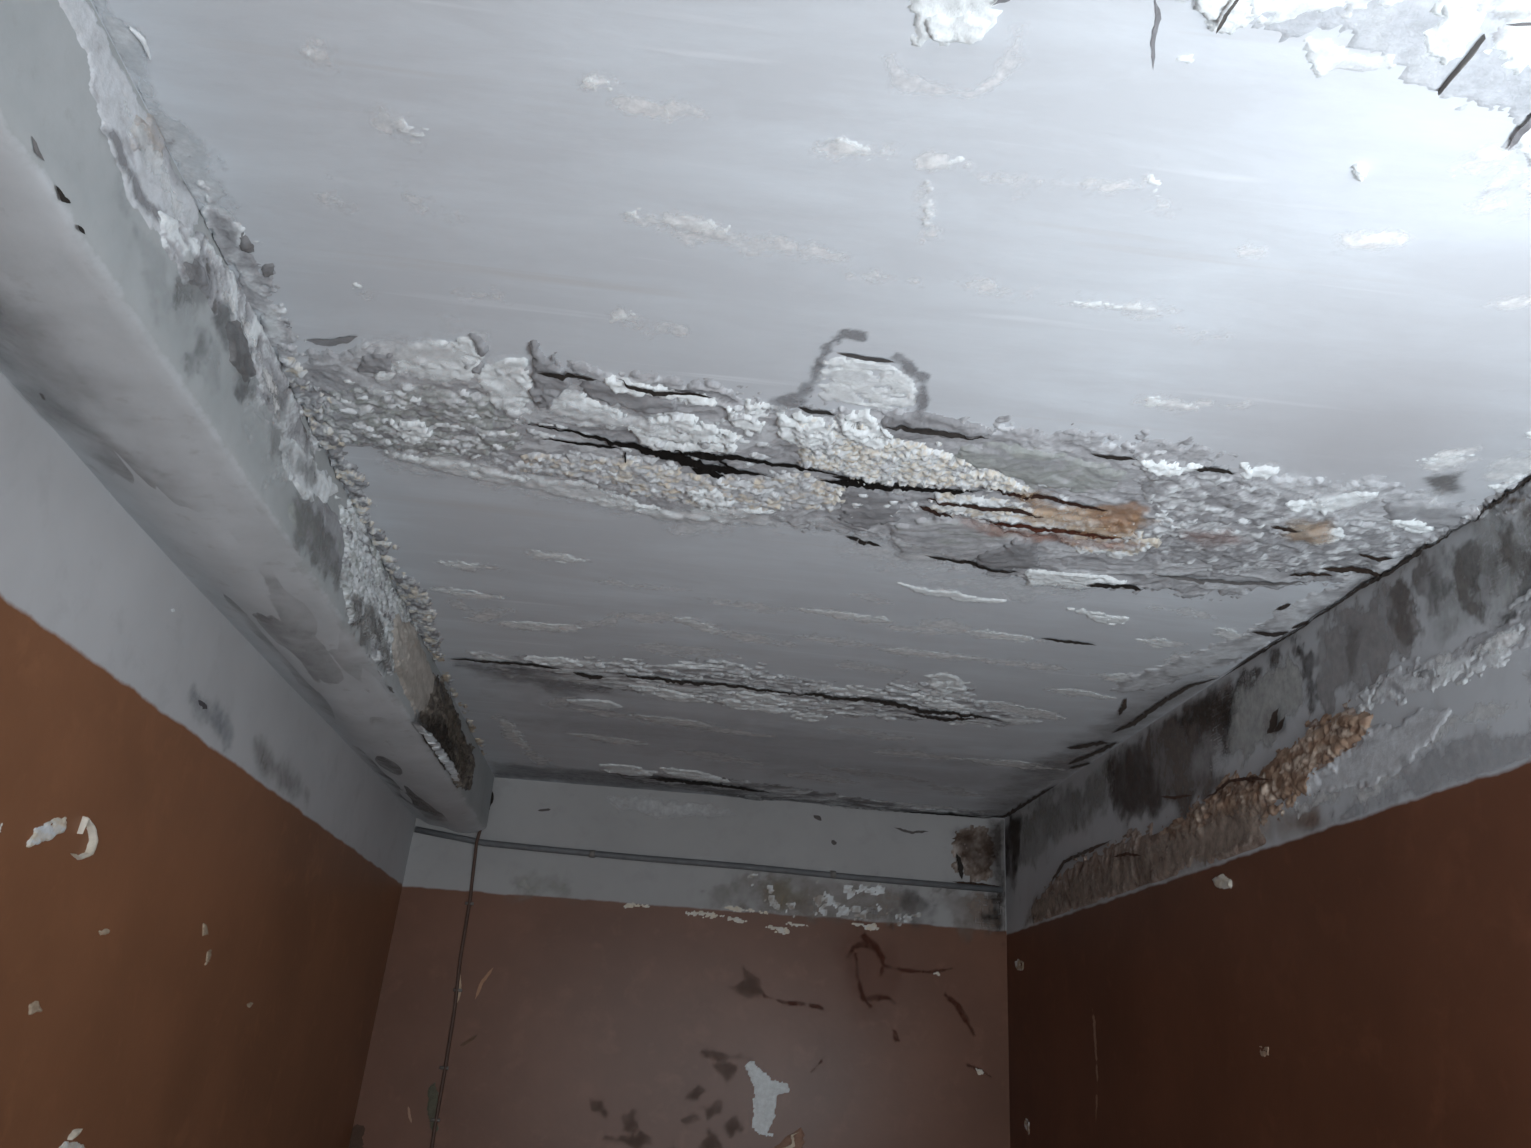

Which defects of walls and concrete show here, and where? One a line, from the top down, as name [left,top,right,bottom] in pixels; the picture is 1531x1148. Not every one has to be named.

spalling [58,0,1531,791]
crack [800,407,834,416]
crack [513,423,1137,540]
damp [1453,508,1531,619]
crack [453,658,1008,723]
damp [1005,554,1436,919]
spalling [1032,588,1531,923]
peeling [26,816,98,860]
spalling [599,751,1004,887]
damp [747,873,926,926]
damp [964,893,1005,931]
peeling [730,1061,805,1148]